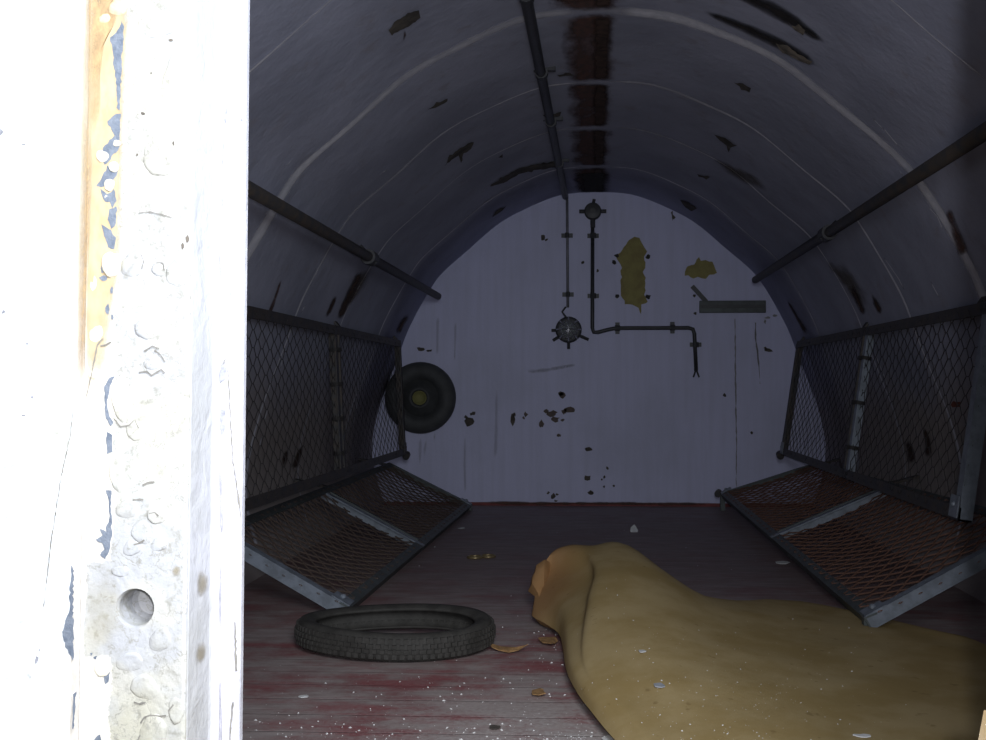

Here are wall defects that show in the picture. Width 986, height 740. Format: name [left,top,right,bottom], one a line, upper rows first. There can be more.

spalling [389,10,420,38]
spalling [711,14,812,65]
spalling [743,0,820,40]
peeling [96,22,124,249]
peeling [99,266,114,320]
peeling [104,376,115,454]
peeling [539,391,575,437]
crack [43,338,111,608]
peeling [96,490,112,559]
peeling [62,565,74,661]